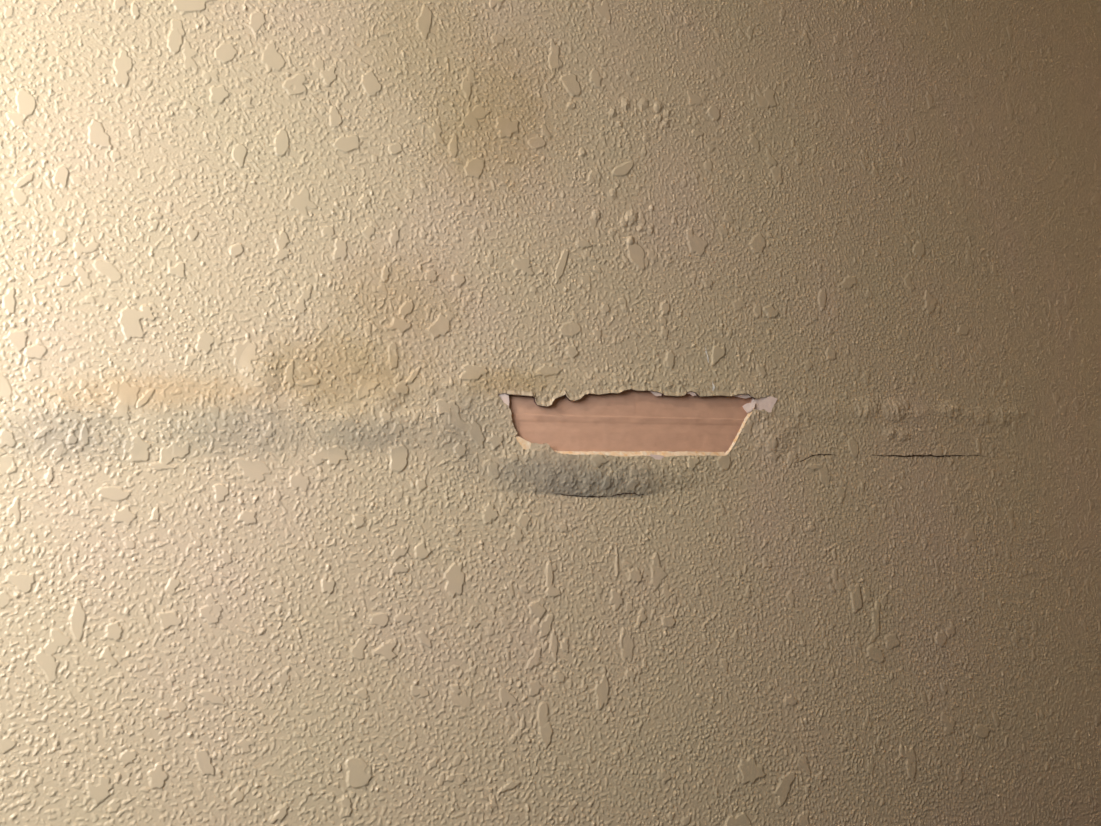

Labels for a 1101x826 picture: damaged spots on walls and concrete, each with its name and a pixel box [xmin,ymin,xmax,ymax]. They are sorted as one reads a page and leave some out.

spalling [498,385,777,460]
crack [873,451,979,459]